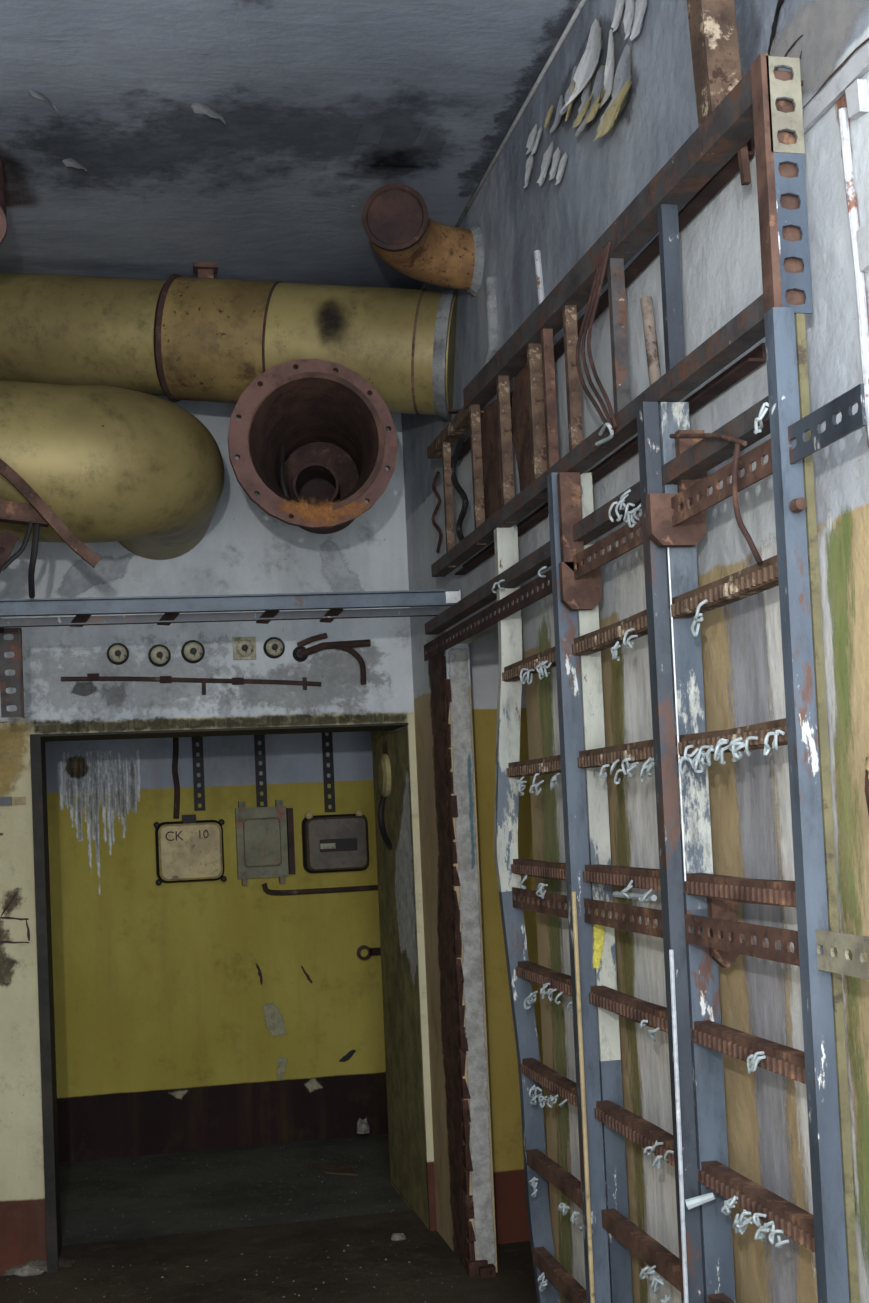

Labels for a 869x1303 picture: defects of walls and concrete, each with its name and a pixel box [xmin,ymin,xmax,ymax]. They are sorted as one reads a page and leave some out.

peeling [62,158,88,171]
peeling [191,103,226,124]
water stain [459,0,576,196]
peeling [523,0,648,188]
water stain [59,750,141,895]
spalling [428,633,496,1278]